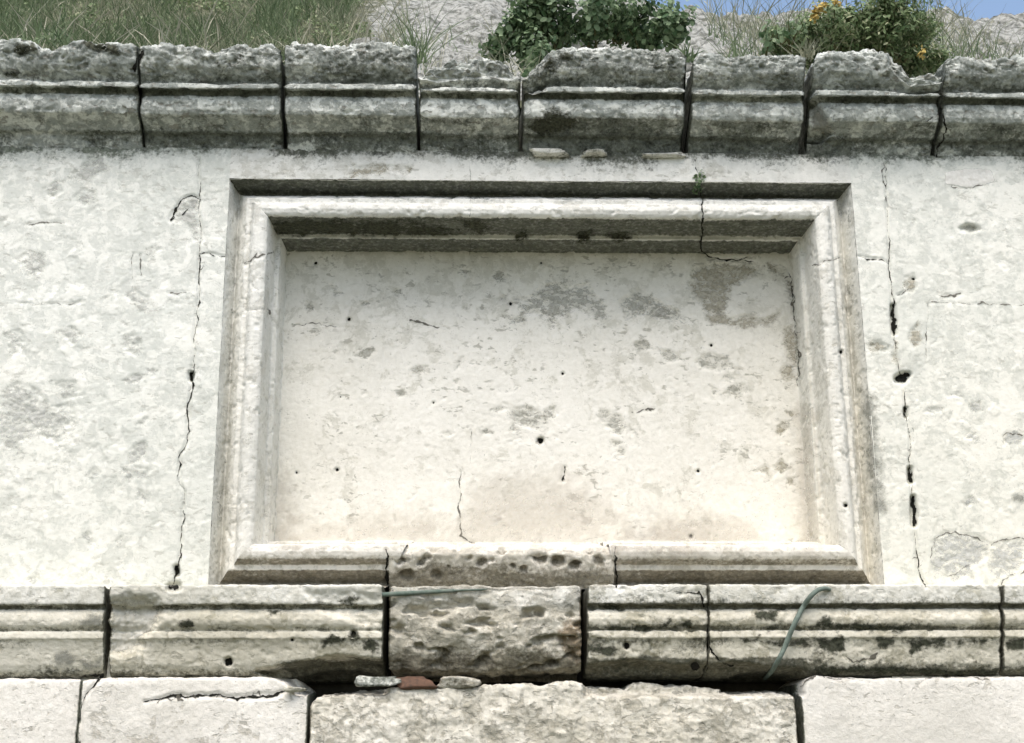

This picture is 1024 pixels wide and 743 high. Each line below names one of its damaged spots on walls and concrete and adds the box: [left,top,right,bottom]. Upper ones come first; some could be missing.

crack [695,160,755,263]
crack [168,172,272,590]
crack [784,166,1024,587]
crack [457,476,475,544]
crack [144,691,285,703]